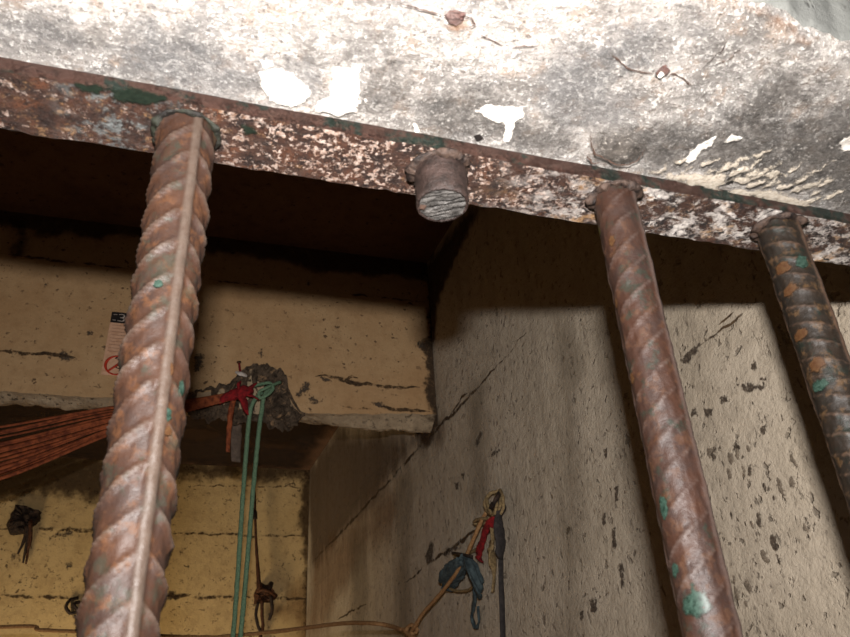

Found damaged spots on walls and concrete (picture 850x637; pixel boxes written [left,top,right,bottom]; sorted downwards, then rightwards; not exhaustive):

spalling [445,10,466,26]
peeling [259,59,311,108]
peeling [315,64,367,117]
spalling [655,65,670,79]
peeling [475,104,525,143]
peeling [839,136,850,152]
flaking render [648,135,844,207]
crack [701,302,756,345]
crack [0,350,76,358]
spalling [187,349,319,433]
crack [315,333,526,559]
crack [407,530,475,582]